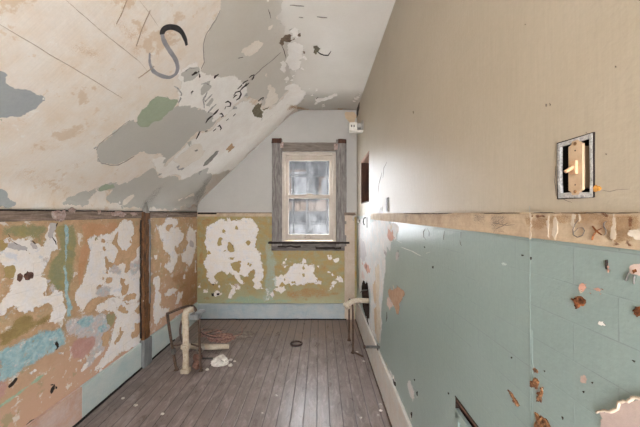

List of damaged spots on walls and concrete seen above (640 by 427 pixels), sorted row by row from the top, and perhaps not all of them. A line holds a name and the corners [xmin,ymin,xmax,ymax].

peeling [0,0,337,372]
peeling [358,206,399,344]
spalling [571,283,603,309]
spalling [595,396,640,427]